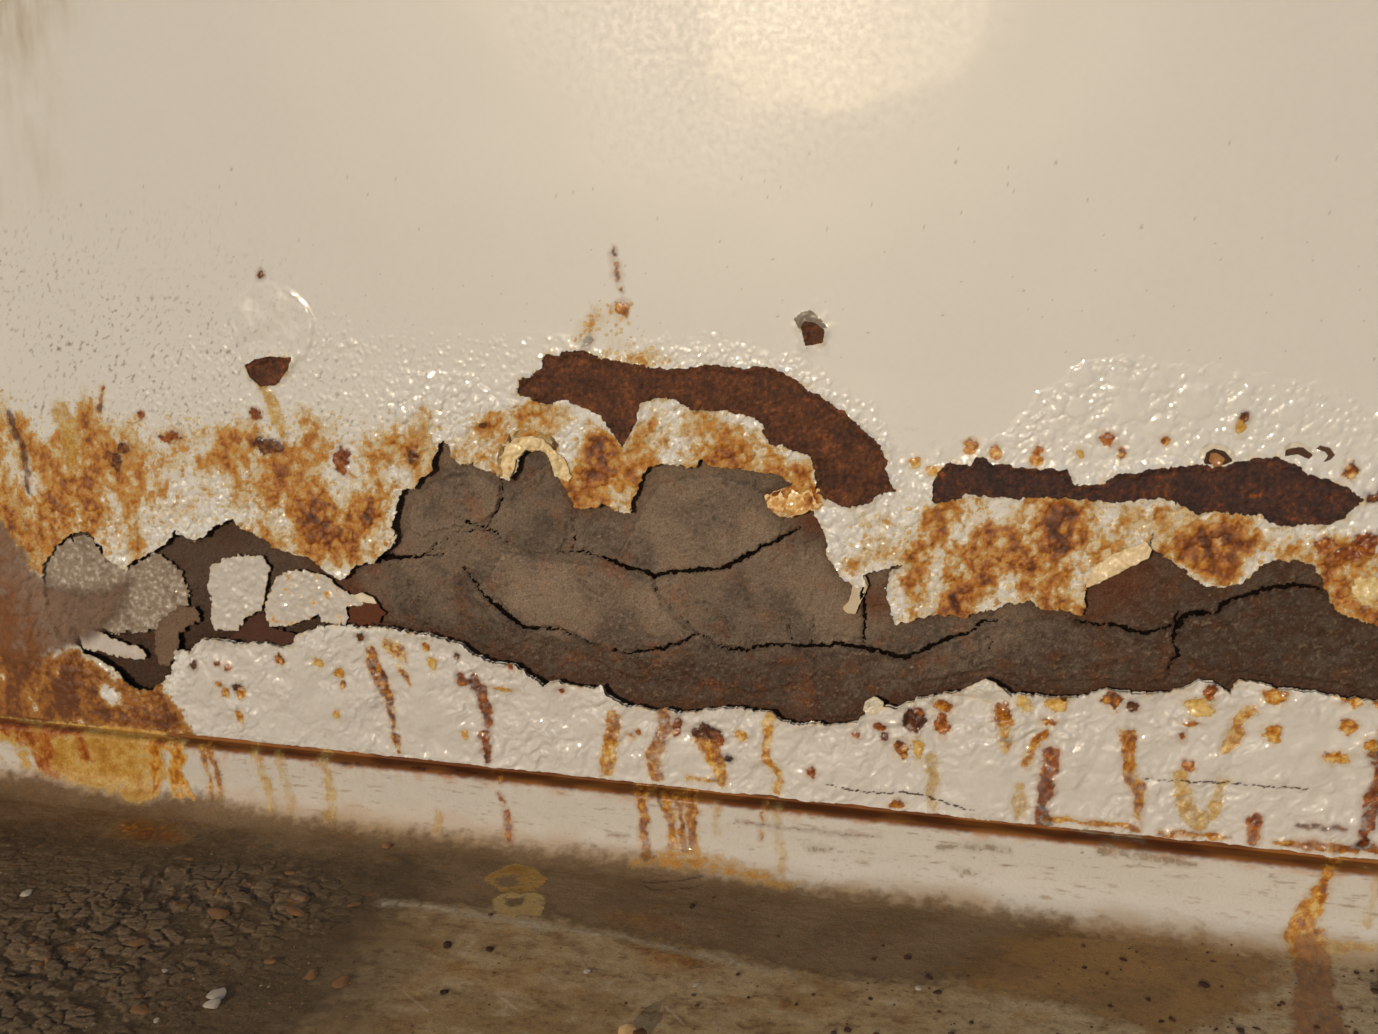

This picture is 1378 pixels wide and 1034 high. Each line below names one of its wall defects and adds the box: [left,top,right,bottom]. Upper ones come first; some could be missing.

corrosion [0,647,222,804]
corrosion [214,661,246,724]
corrosion [356,633,411,754]
corrosion [0,384,823,579]
corrosion [454,653,512,841]
crack [364,478,998,670]
corrosion [600,708,790,888]
peeling [42,350,1378,724]
corrosion [851,700,953,786]
corrosion [842,497,1378,627]
corrosion [994,684,1378,1034]
crack [1075,582,1323,675]